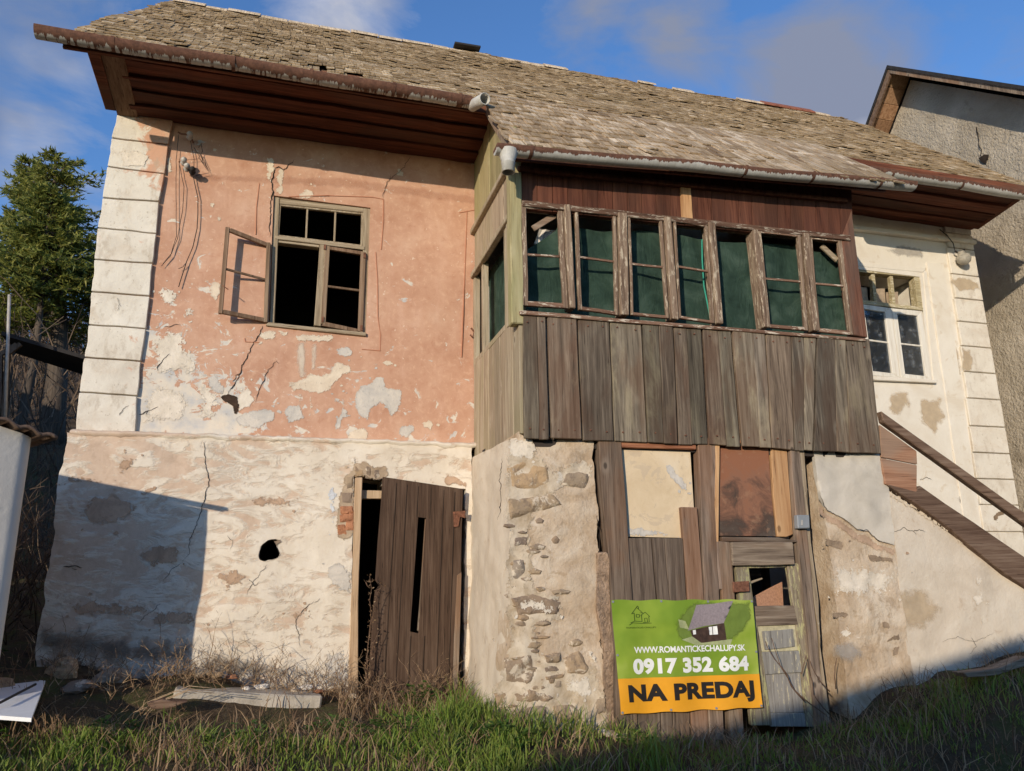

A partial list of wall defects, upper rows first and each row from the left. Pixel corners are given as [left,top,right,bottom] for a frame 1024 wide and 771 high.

crack [269,162,293,235]
peeling [152,280,180,311]
peeling [205,281,220,300]
crack [228,326,279,399]
peeling [141,308,402,439]
water stain [890,393,909,413]
water stain [922,401,945,431]
crack [168,442,210,575]
spalling [328,460,388,540]
peeling [819,506,909,601]
spalling [832,612,860,639]
spalling [882,622,900,656]